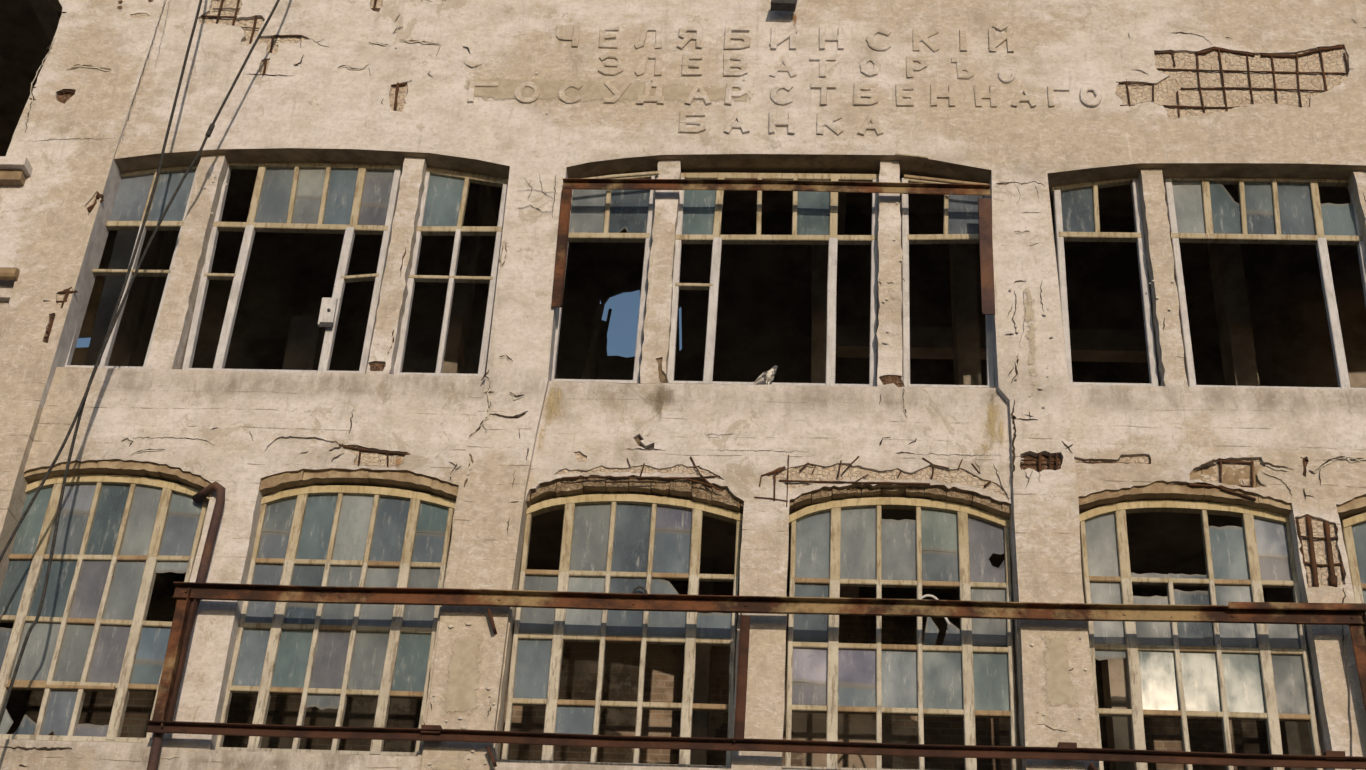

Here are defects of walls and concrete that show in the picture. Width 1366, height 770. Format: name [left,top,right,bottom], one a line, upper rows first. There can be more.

spalling [199,0,309,78]
spalling [57,90,75,104]
spalling [389,82,408,112]
spalling [1115,45,1349,119]
crack [995,181,1043,246]
crack [879,280,1073,500]
crack [450,355,529,536]
crack [705,433,796,452]
spalling [1020,452,1151,472]
spalling [1188,459,1264,501]
spalling [1292,515,1345,588]